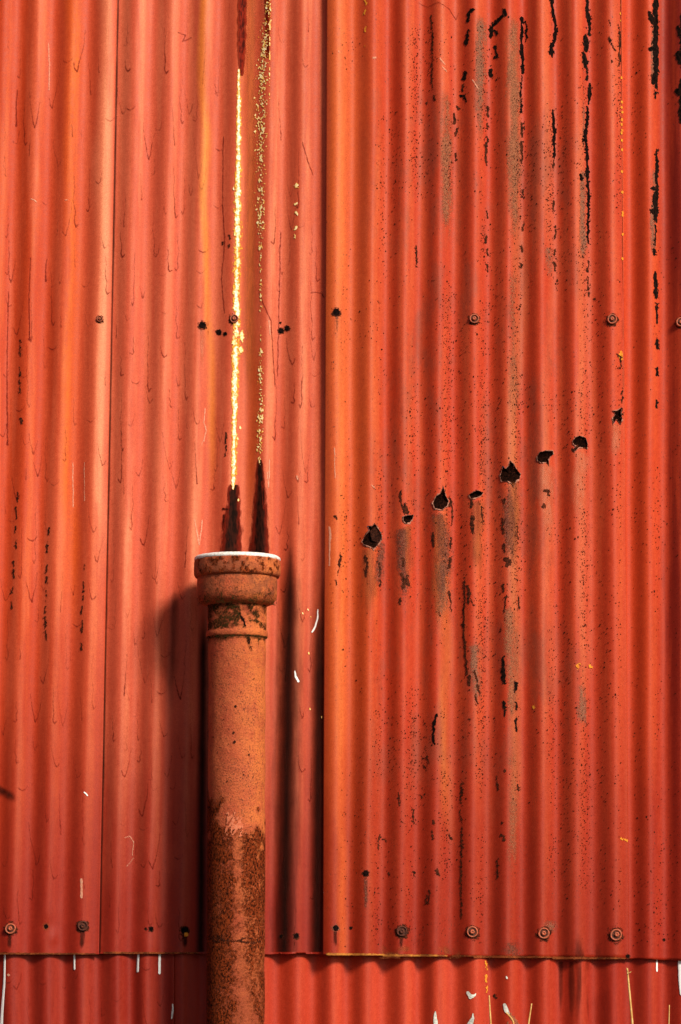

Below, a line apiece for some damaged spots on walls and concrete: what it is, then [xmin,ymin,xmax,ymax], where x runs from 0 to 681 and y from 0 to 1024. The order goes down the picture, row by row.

peeling [441,8,525,231]
peeling [581,0,593,131]
peeling [648,0,660,99]
rust [197,460,279,574]
rust [326,12,680,959]